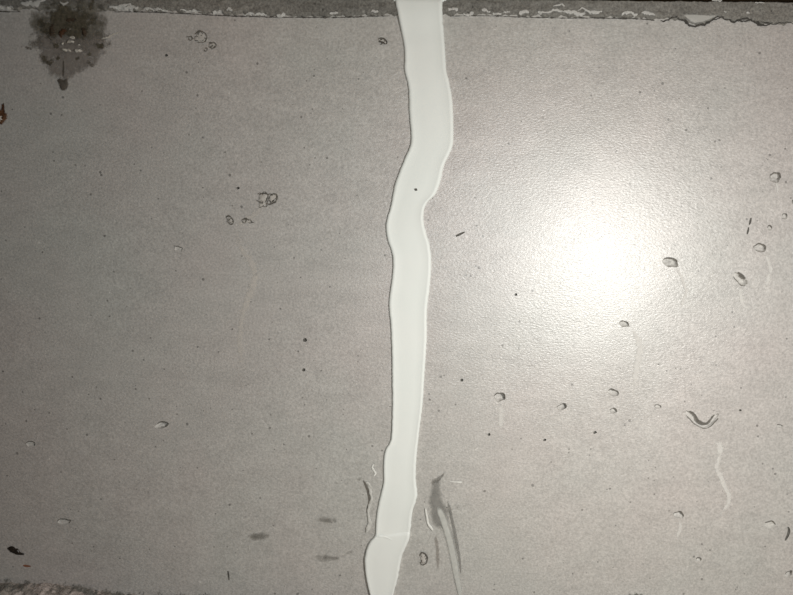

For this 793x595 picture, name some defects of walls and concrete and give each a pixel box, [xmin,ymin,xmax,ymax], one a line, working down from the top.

water stain [26,0,120,90]
peeling [448,3,602,16]
peeling [684,14,715,23]
water stain [437,505,462,595]